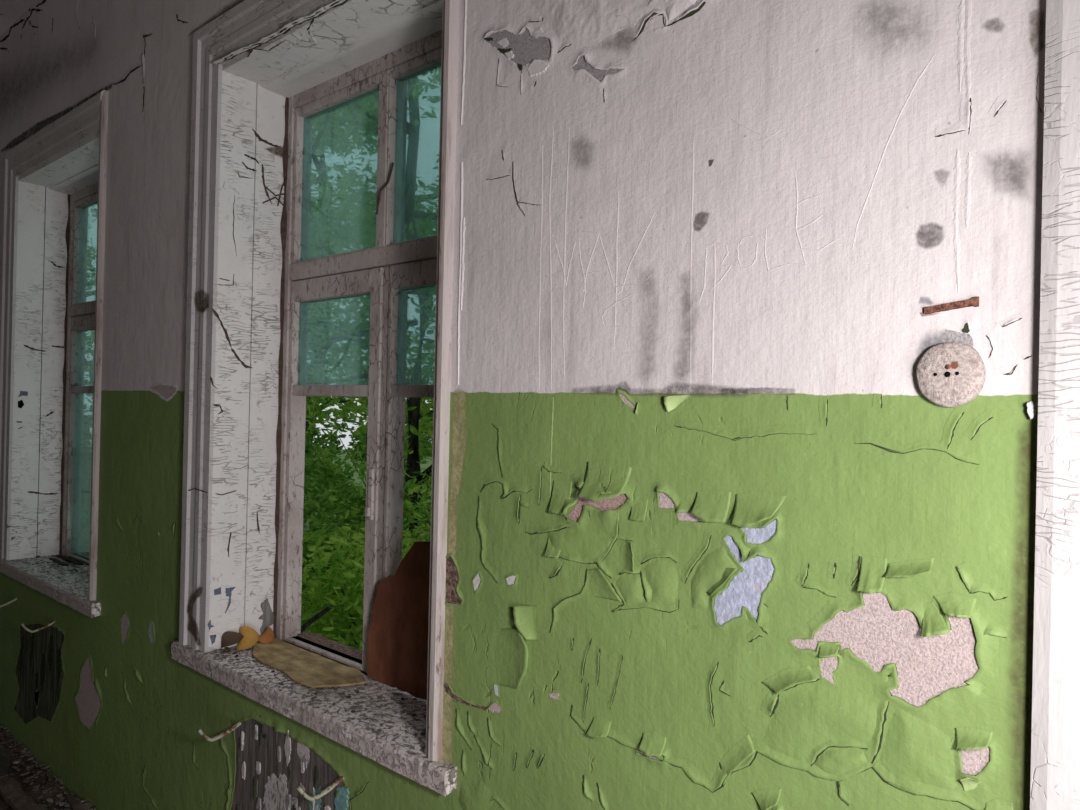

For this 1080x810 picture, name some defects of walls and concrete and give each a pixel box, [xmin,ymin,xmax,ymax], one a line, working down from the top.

crack [0,0,46,52]
spalling [479,19,633,94]
corrosion [921,296,979,316]
peeling [663,394,695,412]
spalling [1027,401,1036,419]
spalling [445,553,485,608]
peeling [547,459,787,636]
flaking render [13,619,103,734]
peeling [443,605,538,715]
peeling [761,556,1001,722]
flaking render [229,708,351,810]
peeling [951,727,1014,810]